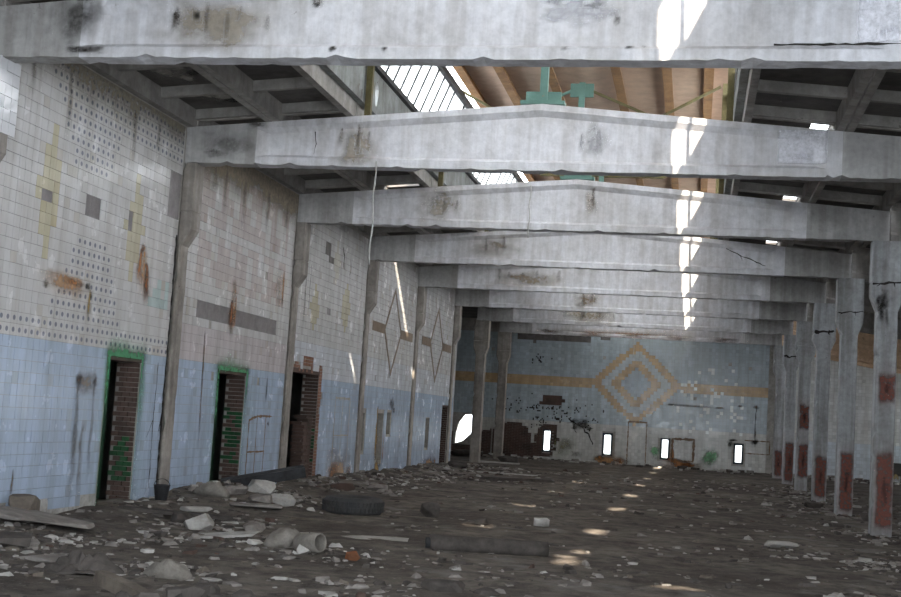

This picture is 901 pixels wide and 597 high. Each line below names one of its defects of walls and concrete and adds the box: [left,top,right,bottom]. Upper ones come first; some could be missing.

crack [774,40,901,48]
rust [137,246,148,294]
crack [873,279,901,287]
flaking render [481,393,604,457]
flaking render [451,431,470,450]